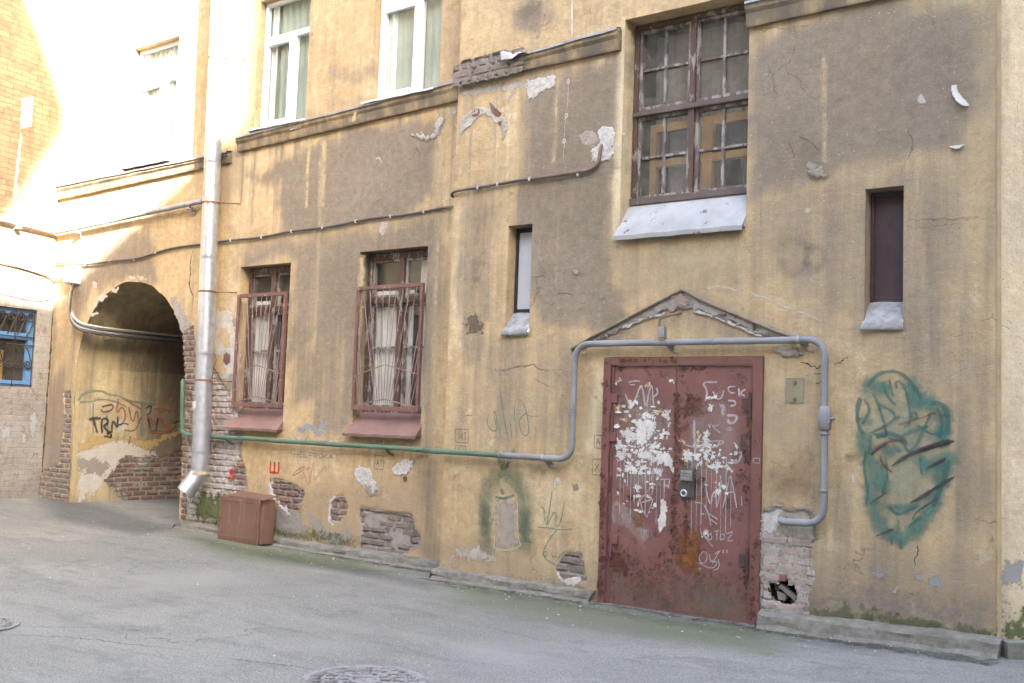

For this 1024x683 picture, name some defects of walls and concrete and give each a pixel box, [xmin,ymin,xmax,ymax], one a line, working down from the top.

flaking render [411,47,556,142]
spalling [579,122,625,168]
flaking render [39,296,248,526]
flaking render [267,477,309,535]
flaking render [328,495,420,555]
flaking render [556,550,587,586]
rust [597,393,684,605]
flaking render [758,503,818,614]